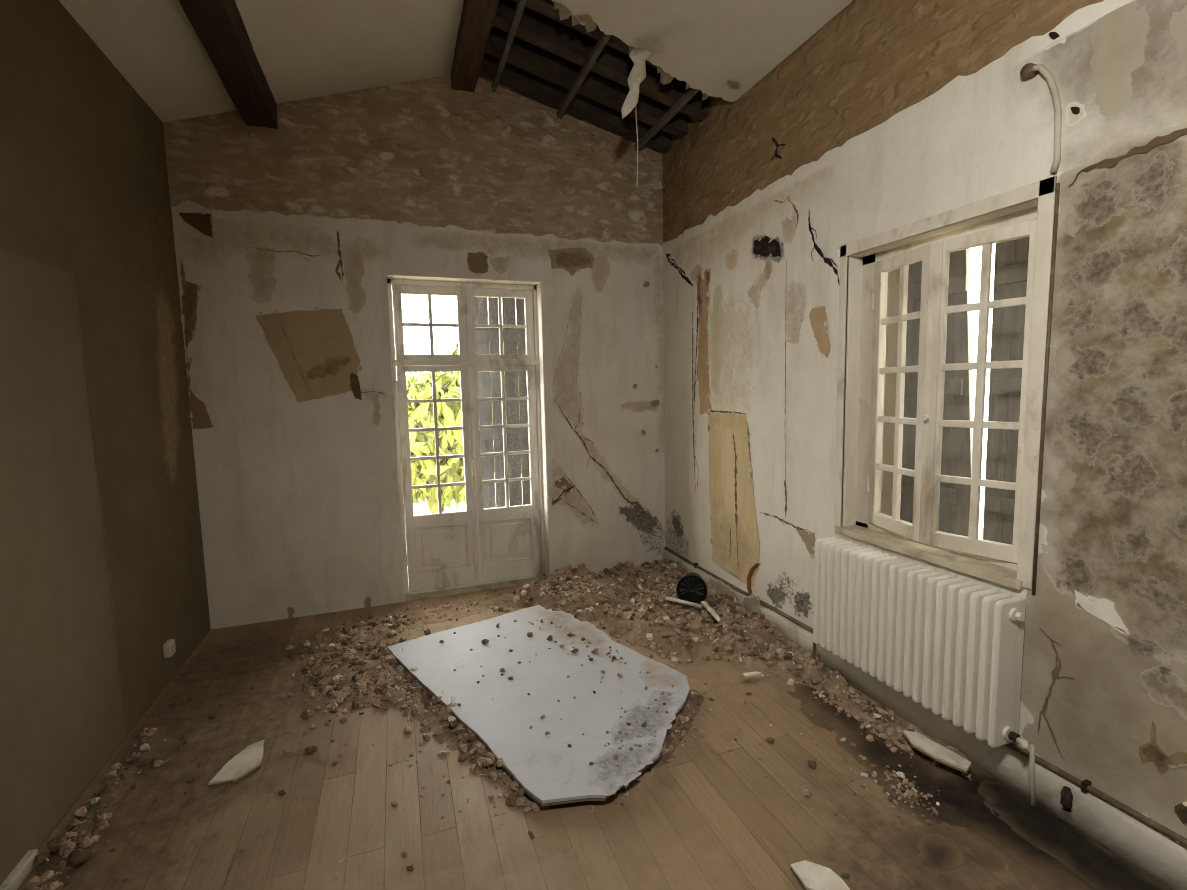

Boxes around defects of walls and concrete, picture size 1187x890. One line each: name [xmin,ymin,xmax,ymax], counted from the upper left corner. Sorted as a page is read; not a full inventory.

crack [775,195,839,284]
peeling [177,255,214,429]
peeling [255,307,362,402]
peeling [547,248,596,431]
peeling [784,279,832,358]
leakage [1005,0,1187,839]
crack [554,400,665,536]
leakage [618,504,690,559]
leakage [711,508,757,582]
leakage [766,570,814,618]
leakage [786,683,1172,890]
peeling [1174,801,1187,826]